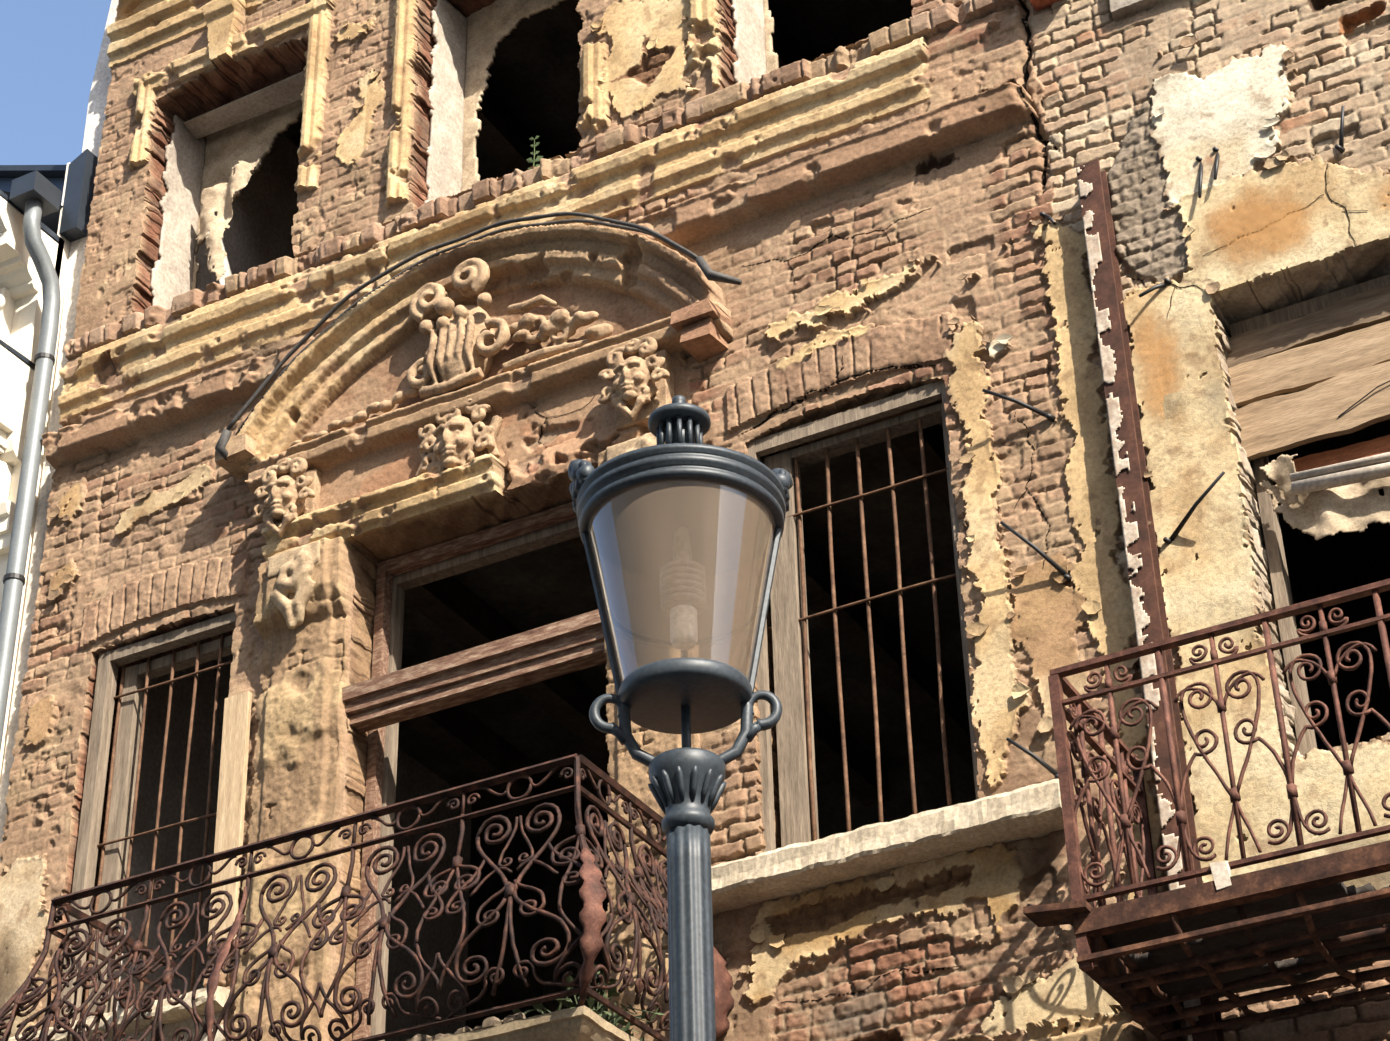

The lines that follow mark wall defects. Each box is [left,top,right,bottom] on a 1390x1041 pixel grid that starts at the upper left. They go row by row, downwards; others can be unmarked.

flaking render [335,15,377,42]
flaking render [335,66,389,167]
flaking render [588,0,693,118]
crack [1008,0,1062,194]
crack [1128,164,1368,318]
flaking render [764,253,942,371]
flaking render [114,461,215,535]
flaking render [943,42,1390,900]
flaking render [740,842,1123,1041]